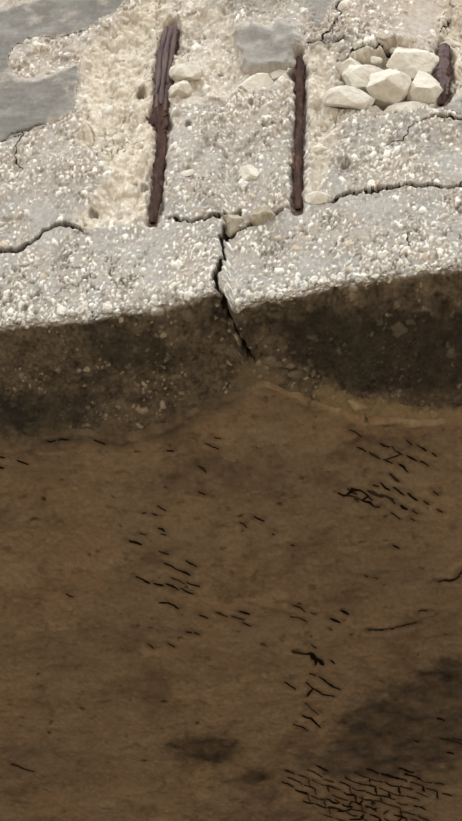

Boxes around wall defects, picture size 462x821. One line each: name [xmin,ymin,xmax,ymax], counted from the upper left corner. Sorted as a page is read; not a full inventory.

crack [1,223,76,253]
rust [145,25,180,224]
crack [174,213,255,359]
spalling [71,0,462,233]
rust [291,56,306,211]
crack [328,181,462,204]
crack [387,113,461,145]
rust [433,43,453,106]
leakage [158,641,462,821]